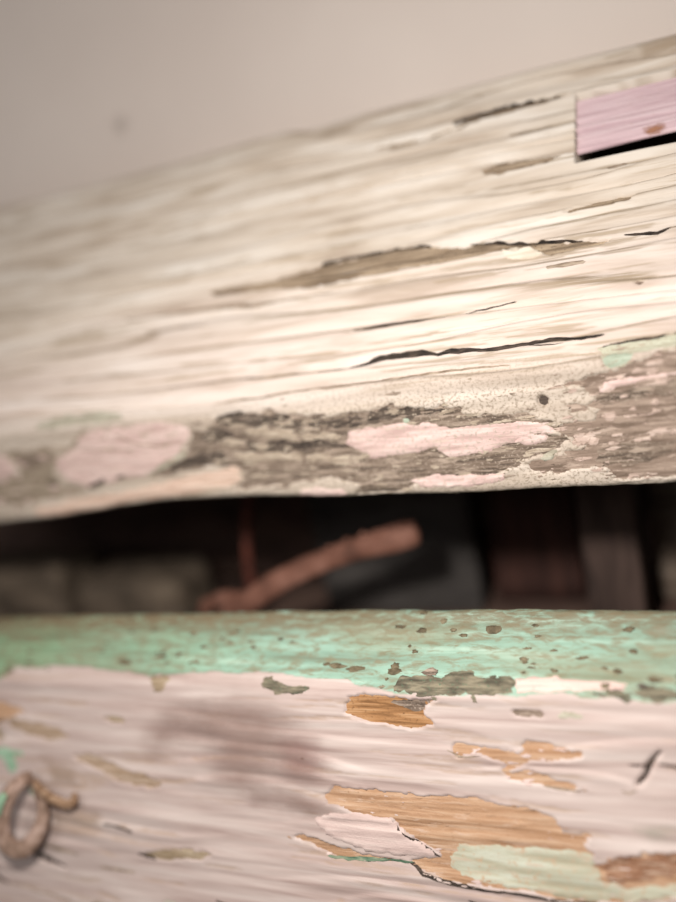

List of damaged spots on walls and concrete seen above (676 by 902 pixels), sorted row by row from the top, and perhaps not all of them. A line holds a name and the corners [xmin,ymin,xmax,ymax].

peeling [211,240,605,296]
crack [140,334,605,404]
peeling [0,331,676,517]
peeling [515,675,648,694]
peeling [0,702,69,741]
peeling [345,694,433,729]
peeling [512,709,544,717]
peeling [448,741,586,792]
crack [622,751,676,795]
peeling [287,785,676,902]